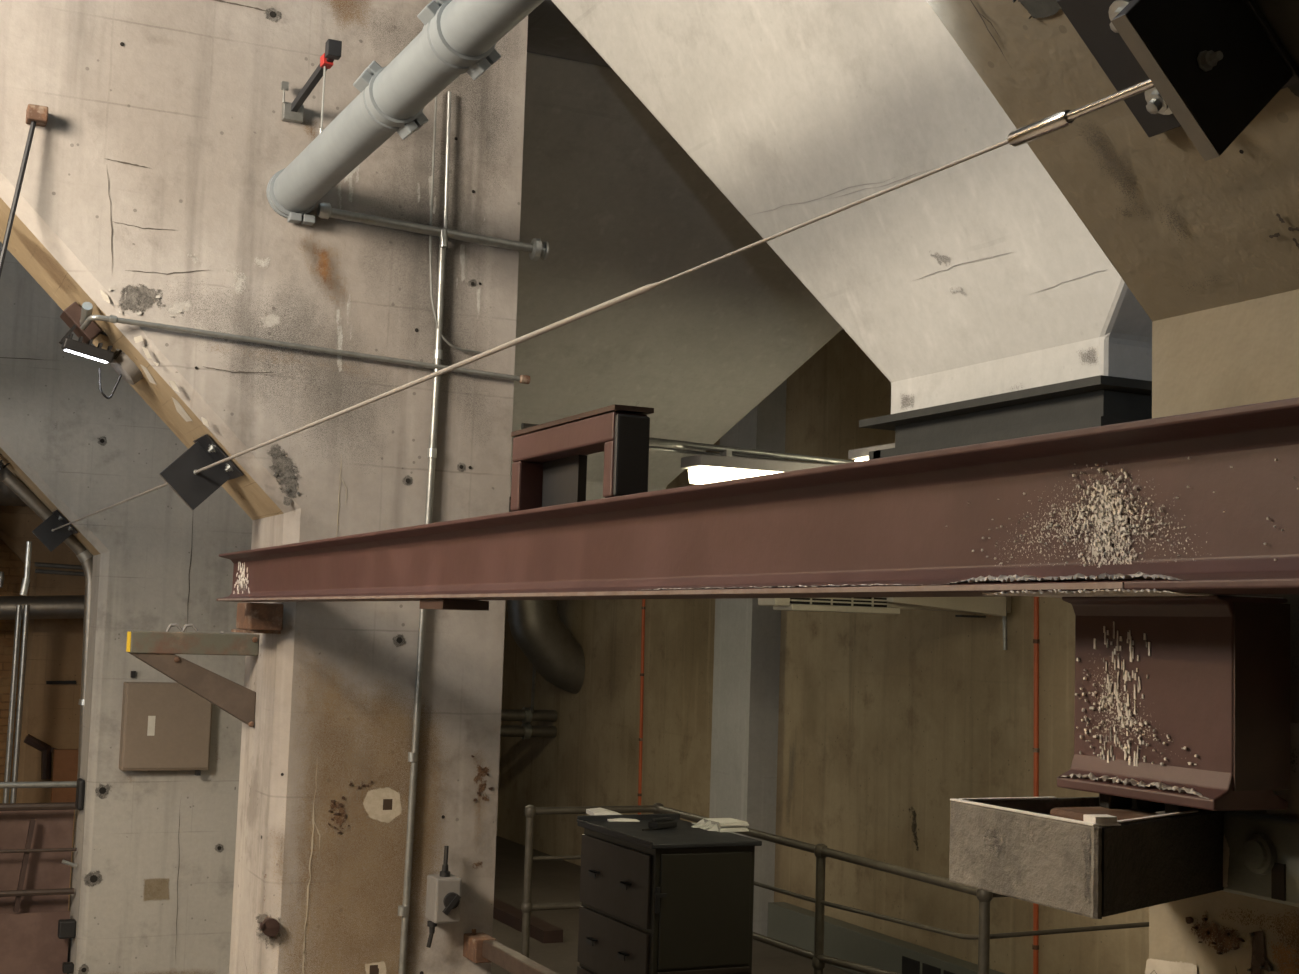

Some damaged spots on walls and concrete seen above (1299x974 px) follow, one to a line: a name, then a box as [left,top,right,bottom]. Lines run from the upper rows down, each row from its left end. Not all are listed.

peeling [1012,0,1061,19]
corrosion [471,748,493,869]